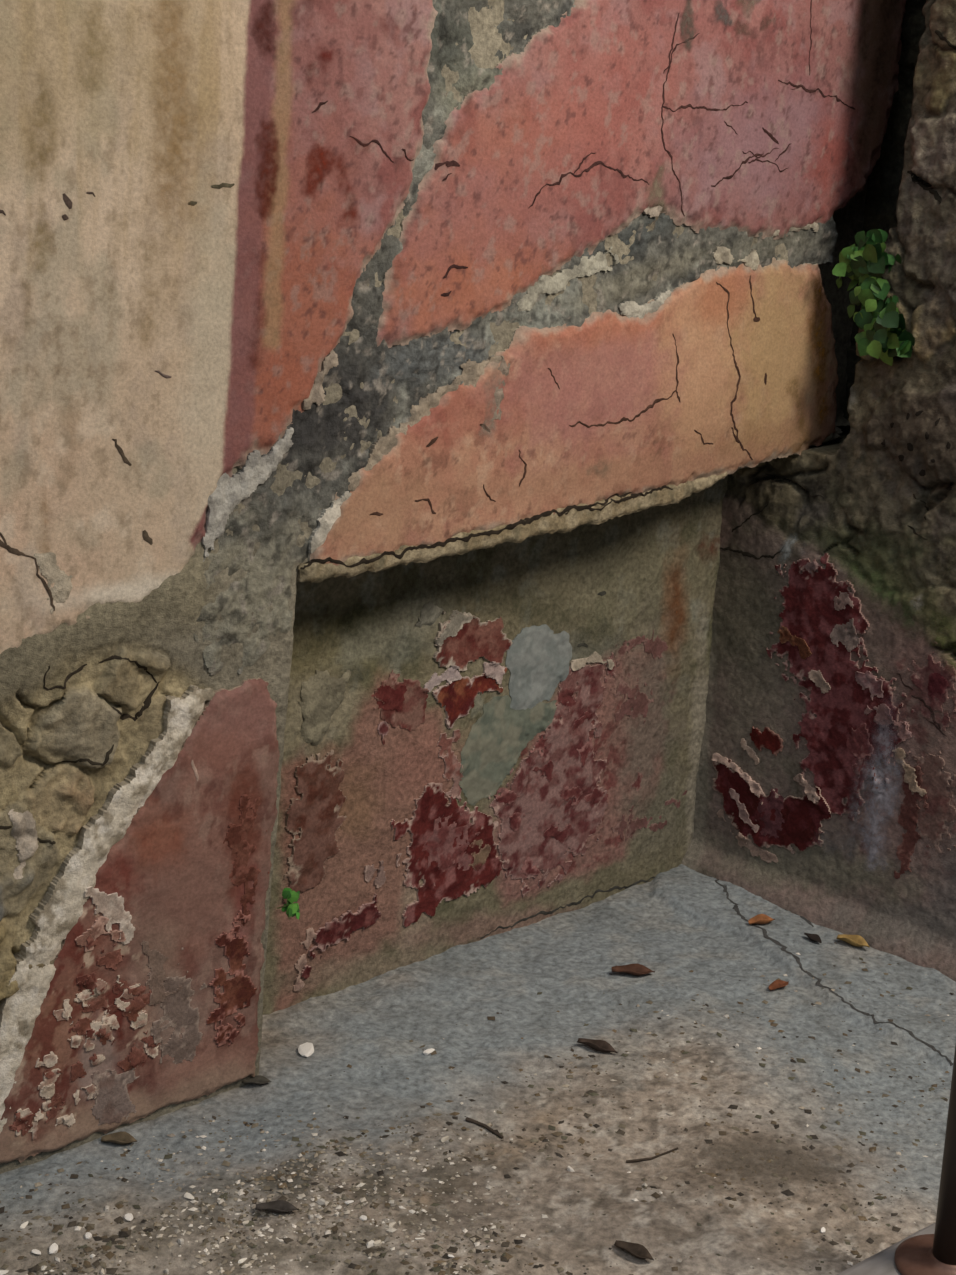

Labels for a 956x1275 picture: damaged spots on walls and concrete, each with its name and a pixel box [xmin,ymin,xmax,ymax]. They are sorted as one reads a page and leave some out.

flaking render [422,0,575,149]
flaking render [681,0,694,49]
crack [778,0,856,110]
crack [194,14,838,675]
crack [0,532,73,614]
flaking render [0,685,269,1140]
peeling [282,749,347,903]
peeling [293,610,688,992]
crack [709,876,953,1066]
peeling [712,553,956,879]